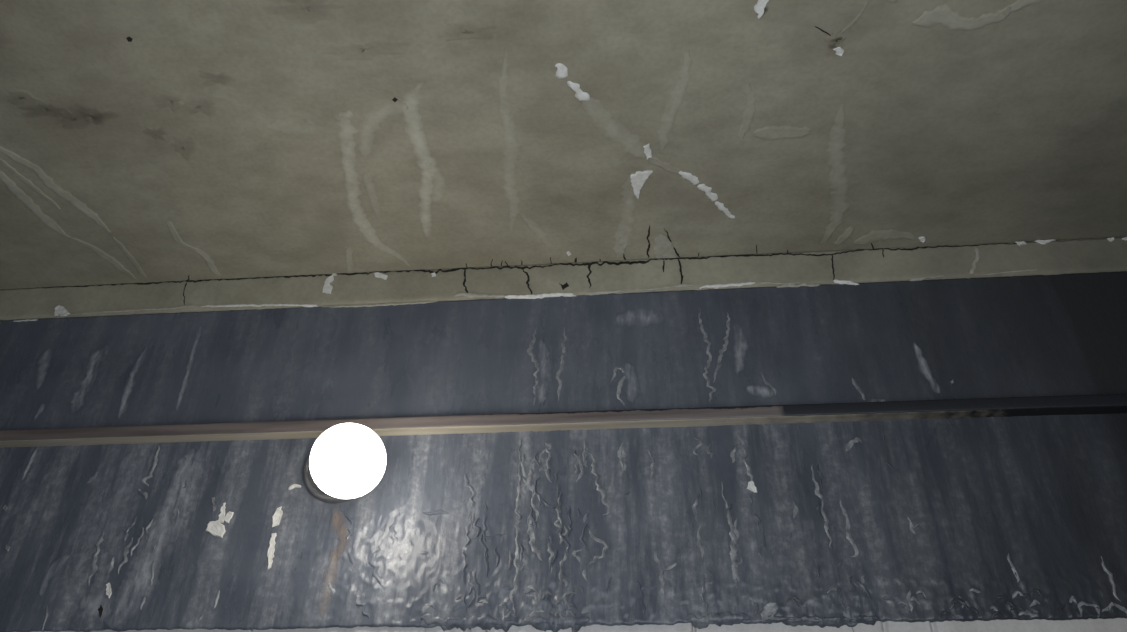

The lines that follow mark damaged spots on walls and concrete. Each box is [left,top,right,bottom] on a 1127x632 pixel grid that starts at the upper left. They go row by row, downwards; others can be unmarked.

spalling [753,0,769,19]
water stain [5,88,122,130]
water stain [0,146,147,280]
water stain [334,81,445,268]
flaking render [455,63,820,299]
flaking render [54,273,436,316]
crack [10,239,1102,305]
peeling [79,445,234,632]
peeling [267,506,283,569]